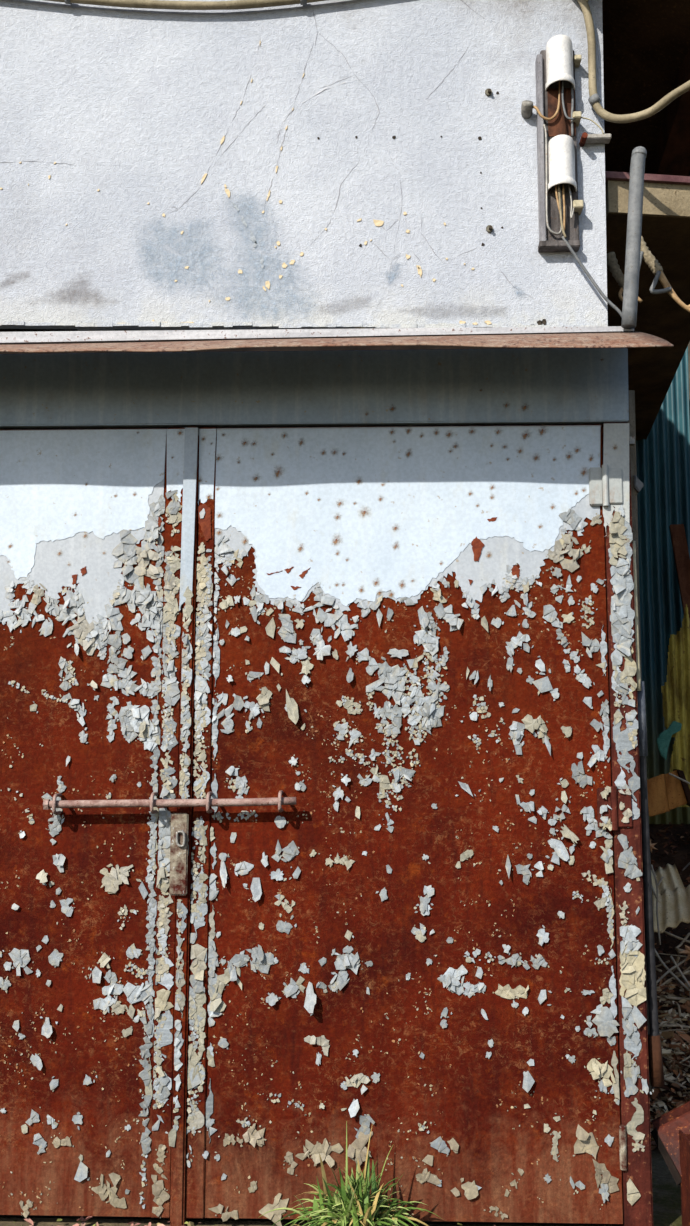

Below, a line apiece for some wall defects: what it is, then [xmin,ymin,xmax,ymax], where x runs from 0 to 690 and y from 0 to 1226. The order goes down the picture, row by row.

crack [165,12,534,301]
corrosion [491,428,592,475]
corrosion [197,488,221,541]
corrosion [471,536,490,561]
corrosion [266,567,311,590]
peeling [0,490,654,1222]
peeling [259,1193,290,1226]